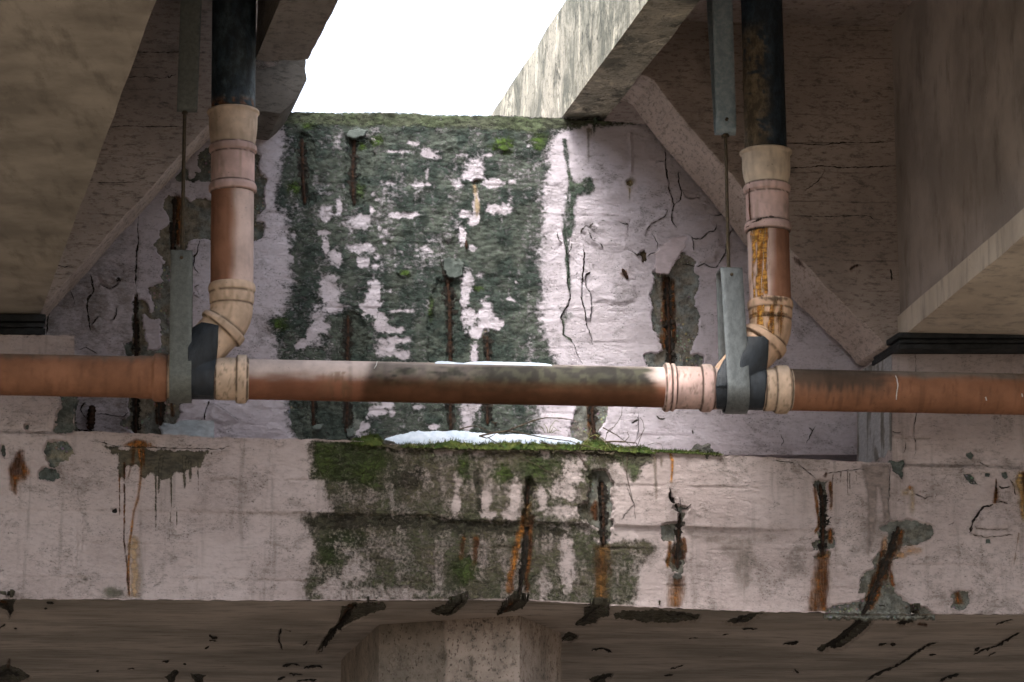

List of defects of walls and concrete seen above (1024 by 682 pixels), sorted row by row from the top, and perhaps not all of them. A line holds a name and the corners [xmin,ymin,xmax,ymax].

spalling [344,128,375,208]
crack [58,216,139,353]
spalling [123,195,211,356]
spalling [431,257,502,363]
crack [557,152,732,364]
spalling [640,236,703,367]
corrosion [9,450,29,493]
corrosion [126,439,152,597]
water stain [104,444,212,597]
corrosion [507,503,533,593]
corrosion [810,554,829,611]
crack [949,462,1016,538]